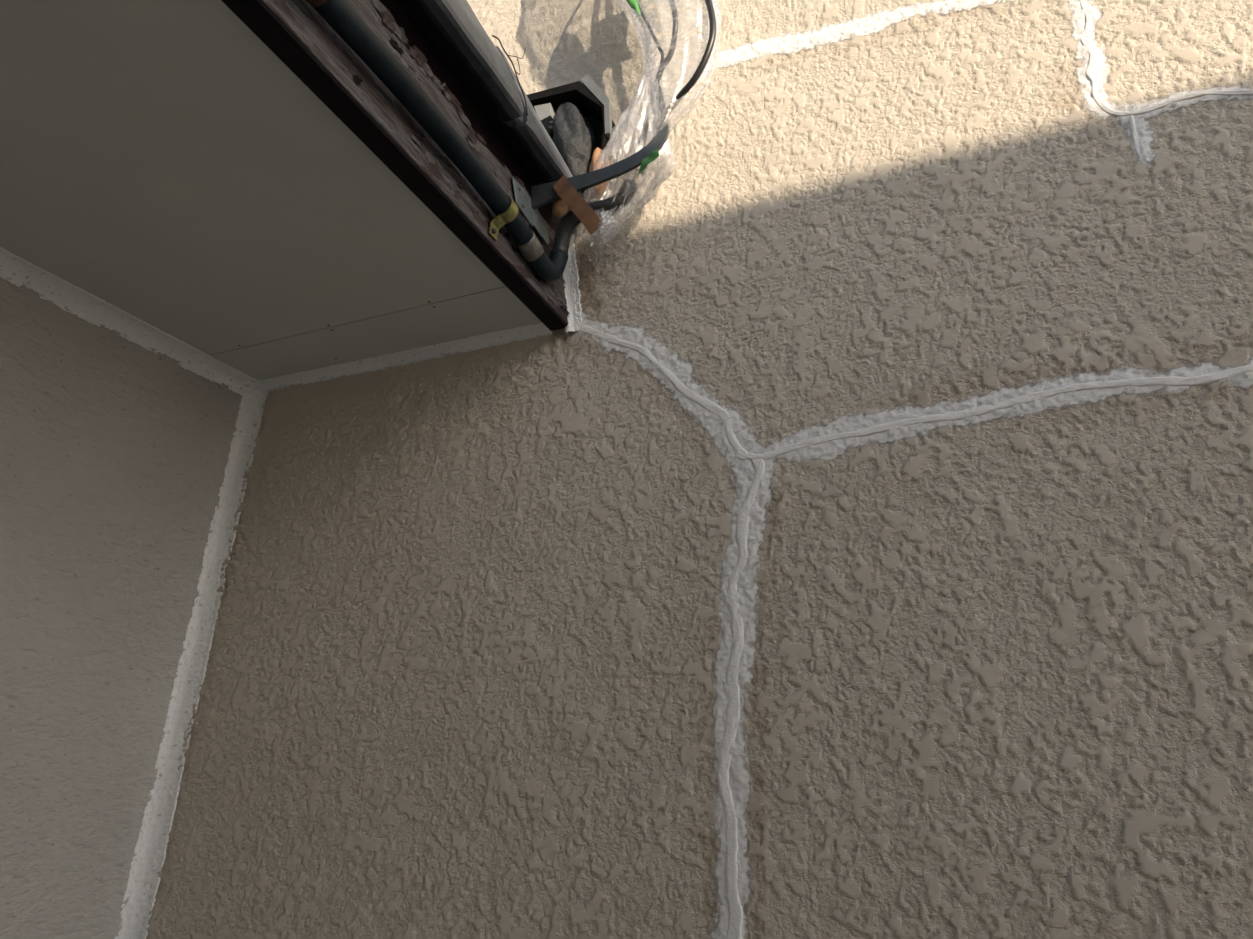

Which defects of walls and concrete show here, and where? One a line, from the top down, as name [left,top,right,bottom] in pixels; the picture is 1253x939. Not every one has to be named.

peeling [371,0,487,149]
crack [704,0,1014,73]
crack [1066,0,1253,168]
peeling [505,232,570,317]
crack [575,311,1253,939]